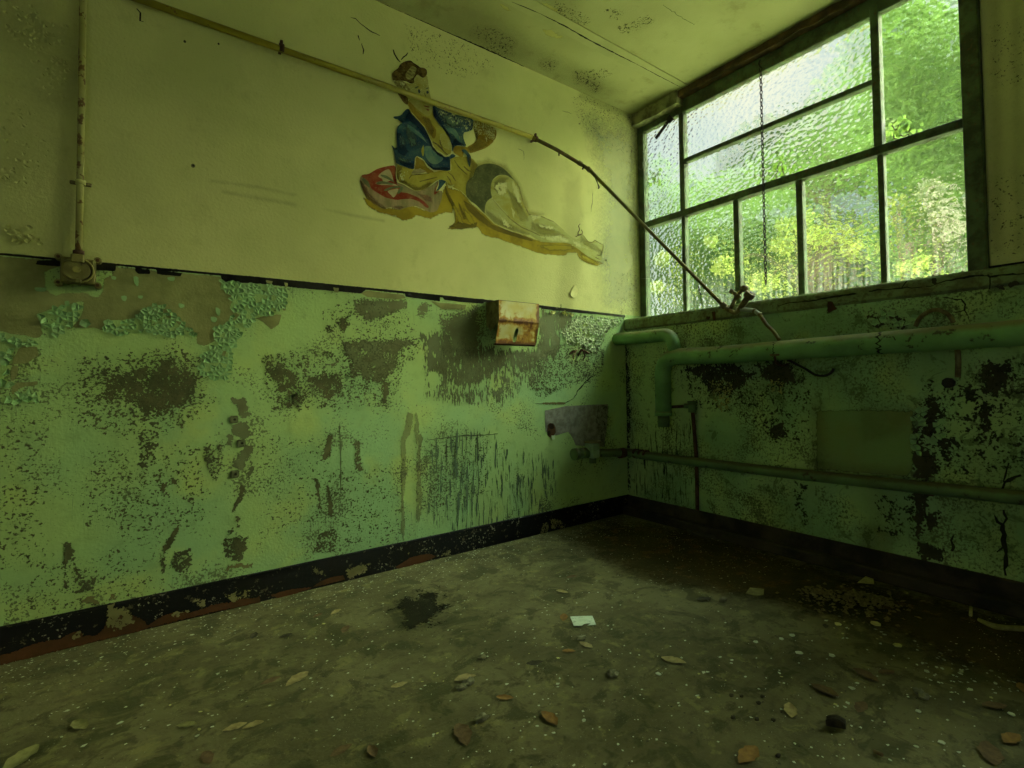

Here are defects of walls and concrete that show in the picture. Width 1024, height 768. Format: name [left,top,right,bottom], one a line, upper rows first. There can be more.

peeling [0,256,490,665]
water stain [400,412,556,541]
peeling [678,359,812,444]
peeling [875,358,1024,562]
crack [994,463,1021,576]
water stain [386,586,454,631]